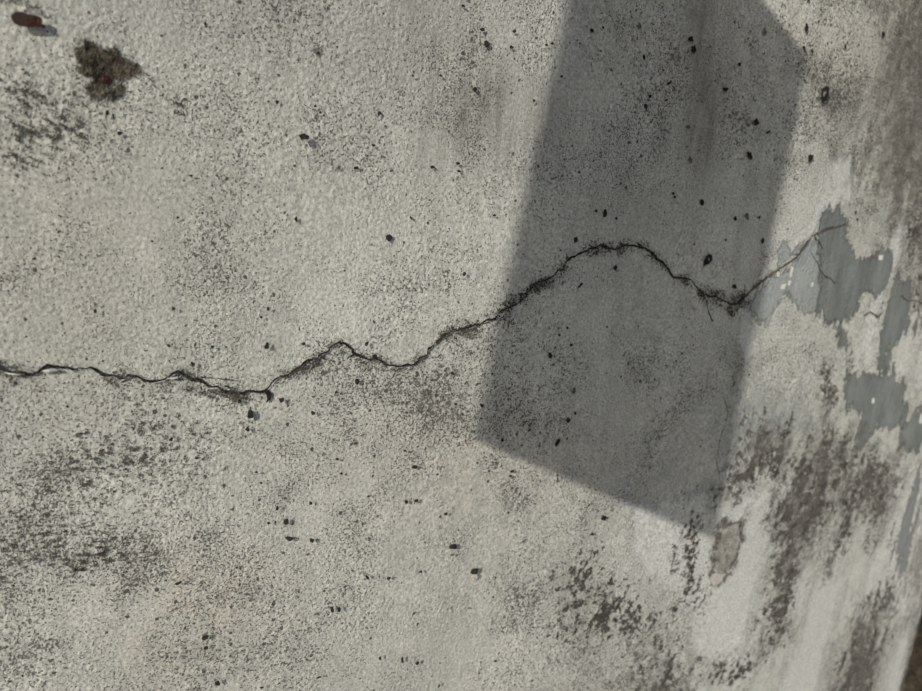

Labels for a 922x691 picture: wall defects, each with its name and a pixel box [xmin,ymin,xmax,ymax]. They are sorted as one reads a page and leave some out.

crack [0,224,847,407]
peeling [744,204,922,455]
water stain [540,362,922,691]
peeling [890,466,921,583]